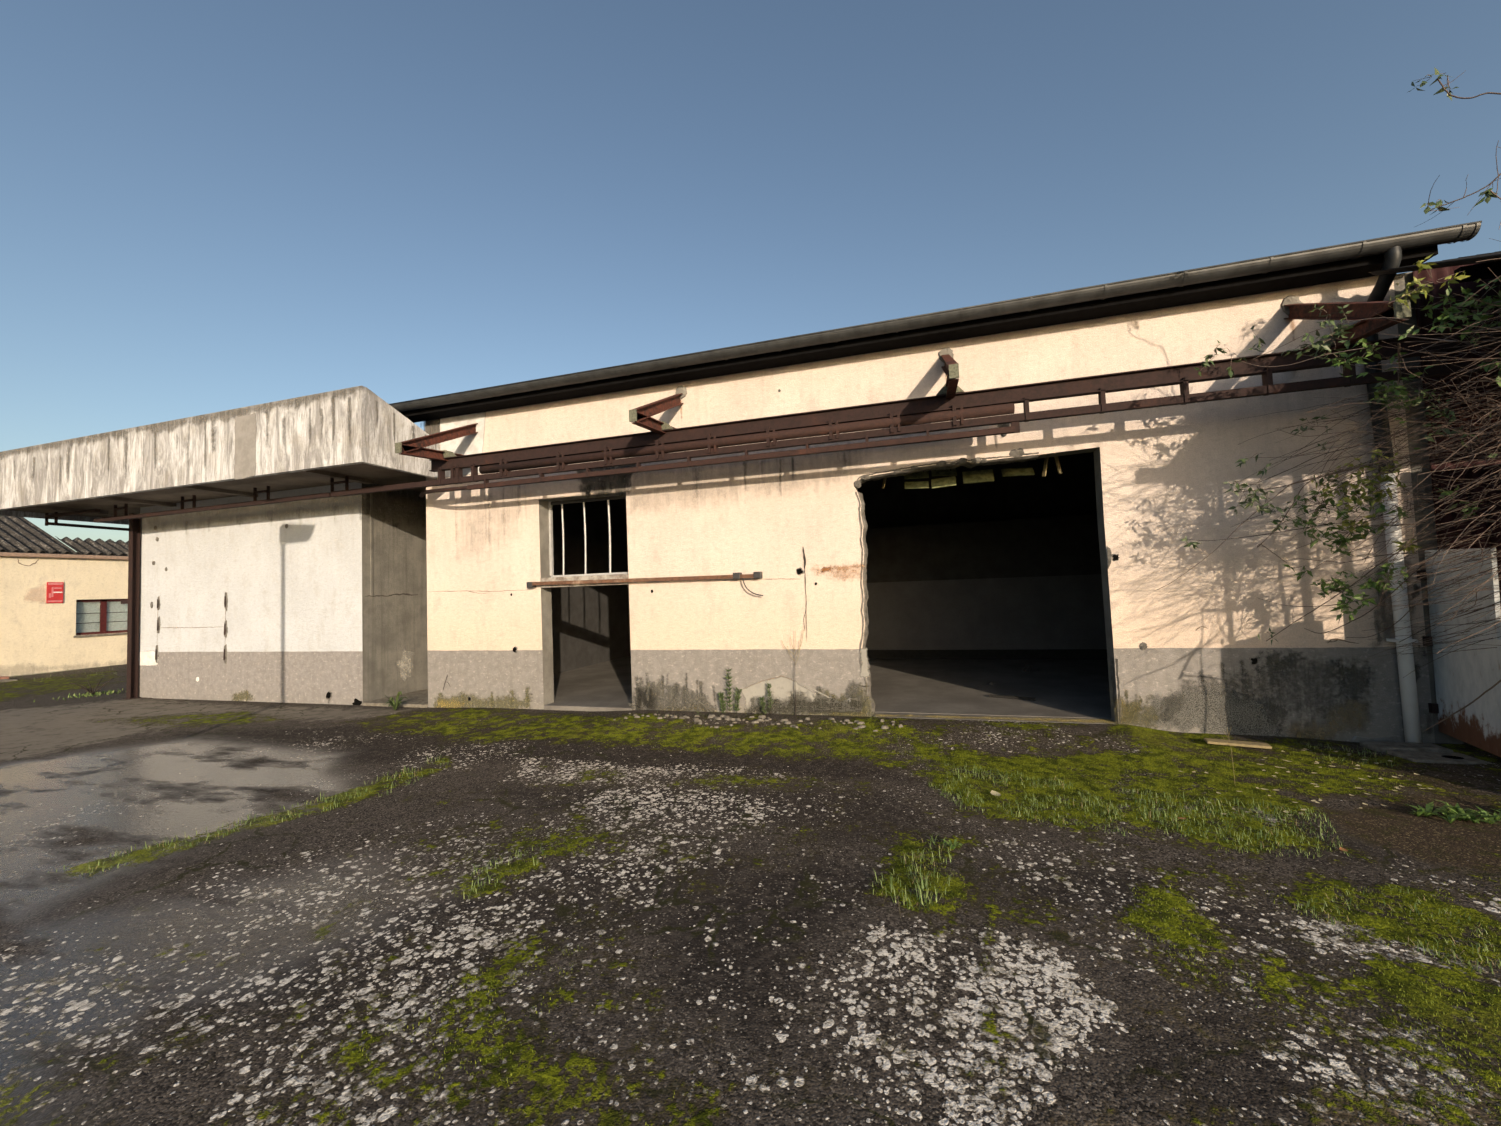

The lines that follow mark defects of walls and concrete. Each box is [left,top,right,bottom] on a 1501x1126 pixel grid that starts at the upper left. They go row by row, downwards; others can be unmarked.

damp [0,386,362,485]
damp [376,402,440,450]